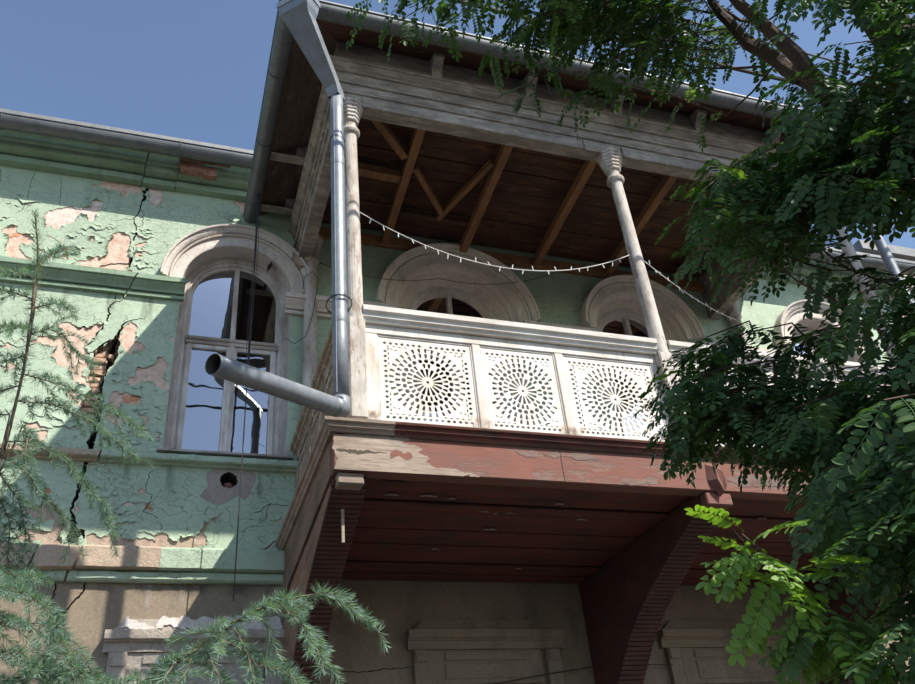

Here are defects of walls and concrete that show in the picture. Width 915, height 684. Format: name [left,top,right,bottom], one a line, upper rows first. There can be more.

peeling [0,181,166,275]
crack [99,188,149,268]
peeling [0,320,171,447]
crack [63,295,145,543]
peeling [332,433,480,484]
peeling [517,451,601,461]
peeling [623,477,660,486]
peeling [726,473,790,488]
peeling [2,487,80,544]
peeling [84,481,221,548]
peeling [121,615,283,630]